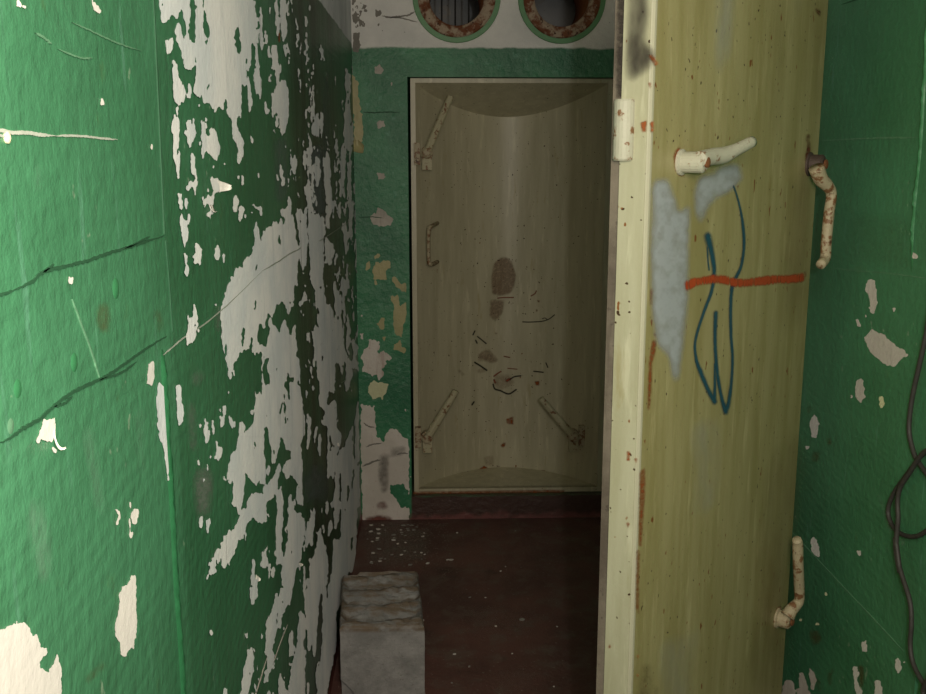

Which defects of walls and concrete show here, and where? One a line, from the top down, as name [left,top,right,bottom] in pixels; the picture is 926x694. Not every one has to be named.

peeling [159,0,411,694]
peeling [856,279,908,367]
peeling [147,361,169,481]
peeling [0,621,62,694]
peeling [115,575,137,657]
peeling [781,668,817,694]